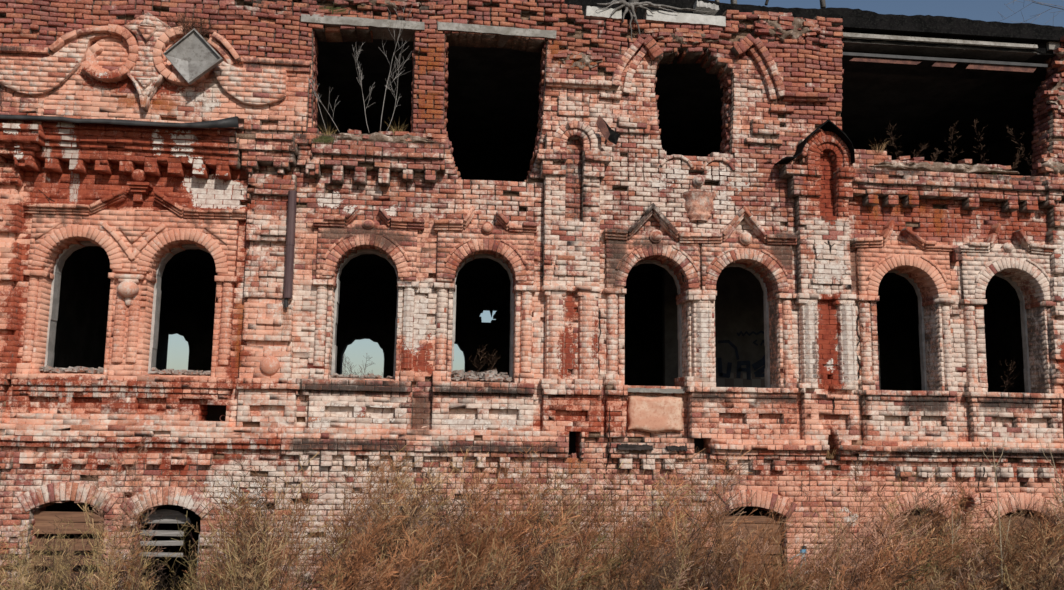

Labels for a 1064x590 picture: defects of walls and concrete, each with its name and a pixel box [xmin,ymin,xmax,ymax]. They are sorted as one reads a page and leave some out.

water stain [23,121,247,222]
peeling [396,282,434,376]
peeling [556,286,582,380]
peeling [803,241,858,387]